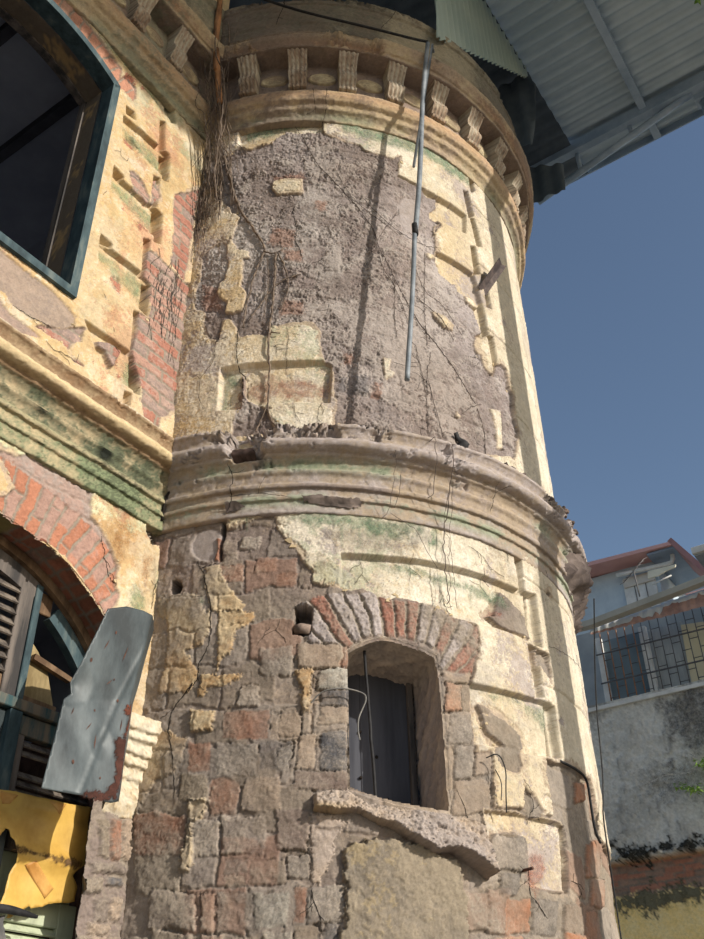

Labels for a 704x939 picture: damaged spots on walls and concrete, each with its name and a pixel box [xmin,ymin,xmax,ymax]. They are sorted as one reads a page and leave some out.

crack [280,204,324,277]
flaking render [0,251,83,348]
flaking render [93,132,518,459]
flaking render [0,452,119,615]
crack [227,464,287,511]
corrosion [82,704,132,801]
crack [161,562,216,799]
flaking render [120,518,620,939]
mould [609,833,704,920]